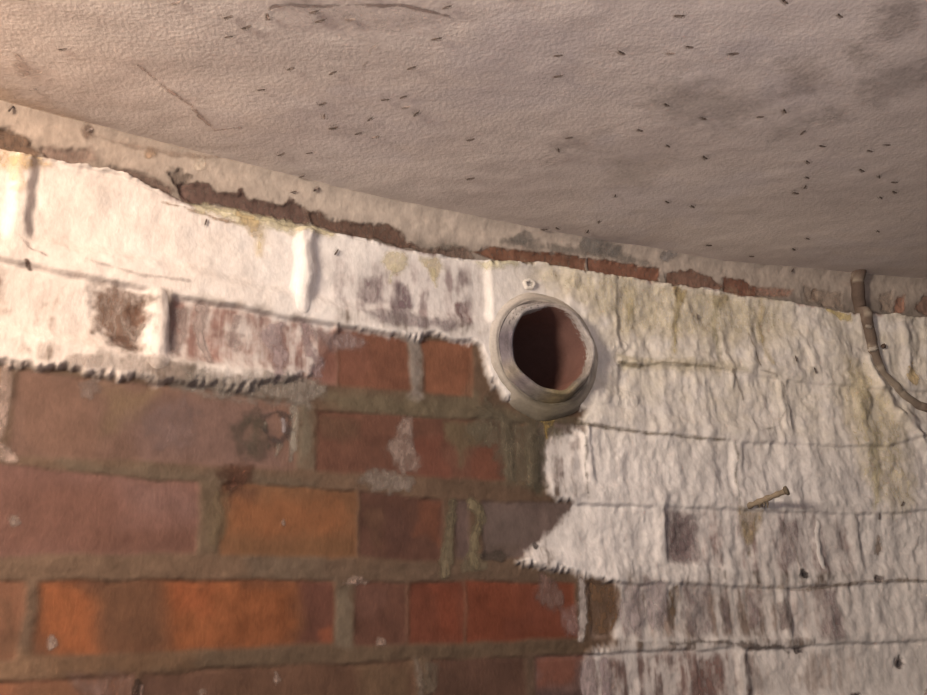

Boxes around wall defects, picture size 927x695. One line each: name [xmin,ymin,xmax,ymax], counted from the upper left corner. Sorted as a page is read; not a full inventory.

crack [163,86,240,130]
flaking render [0,129,91,163]
flaking render [115,155,791,296]
peeling [91,286,152,351]
peeling [372,286,471,331]
crack [132,679,144,695]